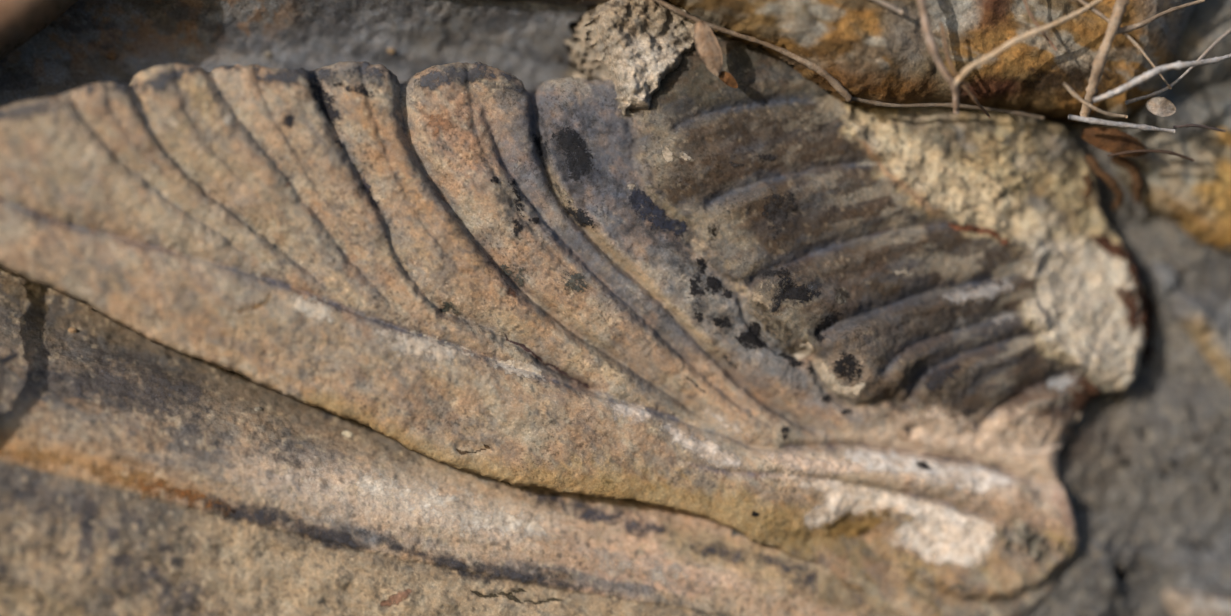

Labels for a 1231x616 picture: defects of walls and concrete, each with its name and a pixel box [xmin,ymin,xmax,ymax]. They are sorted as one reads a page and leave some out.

corrosion [1089,235,1157,367]